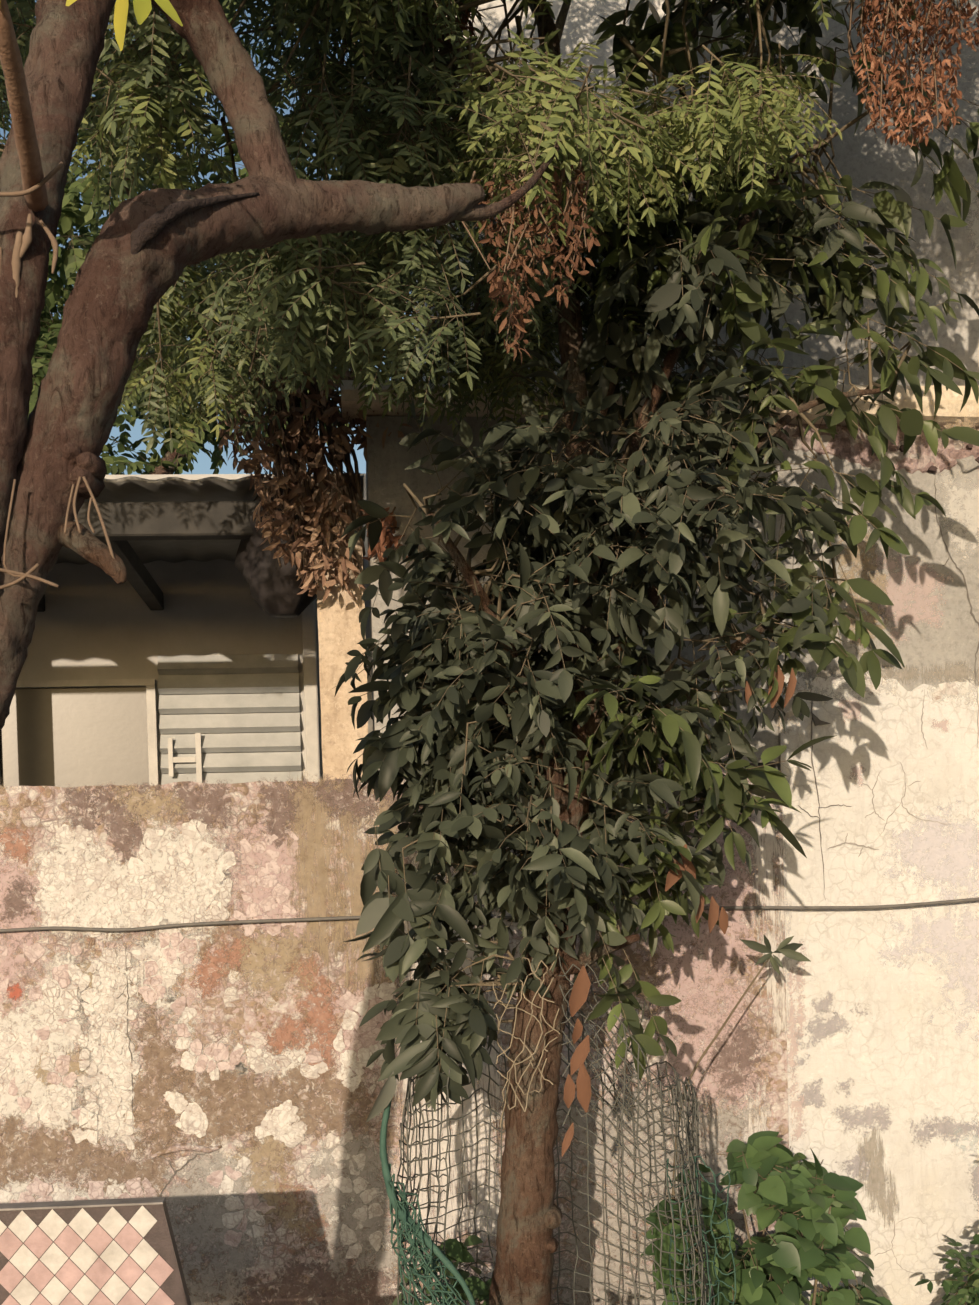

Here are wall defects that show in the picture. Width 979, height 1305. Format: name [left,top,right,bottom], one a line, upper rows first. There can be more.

spalling [767,423,979,474]
crack [934,481,979,747]
flaking render [0,786,418,1259]
peeling [437,909,497,1009]
peeling [395,1037,509,1249]